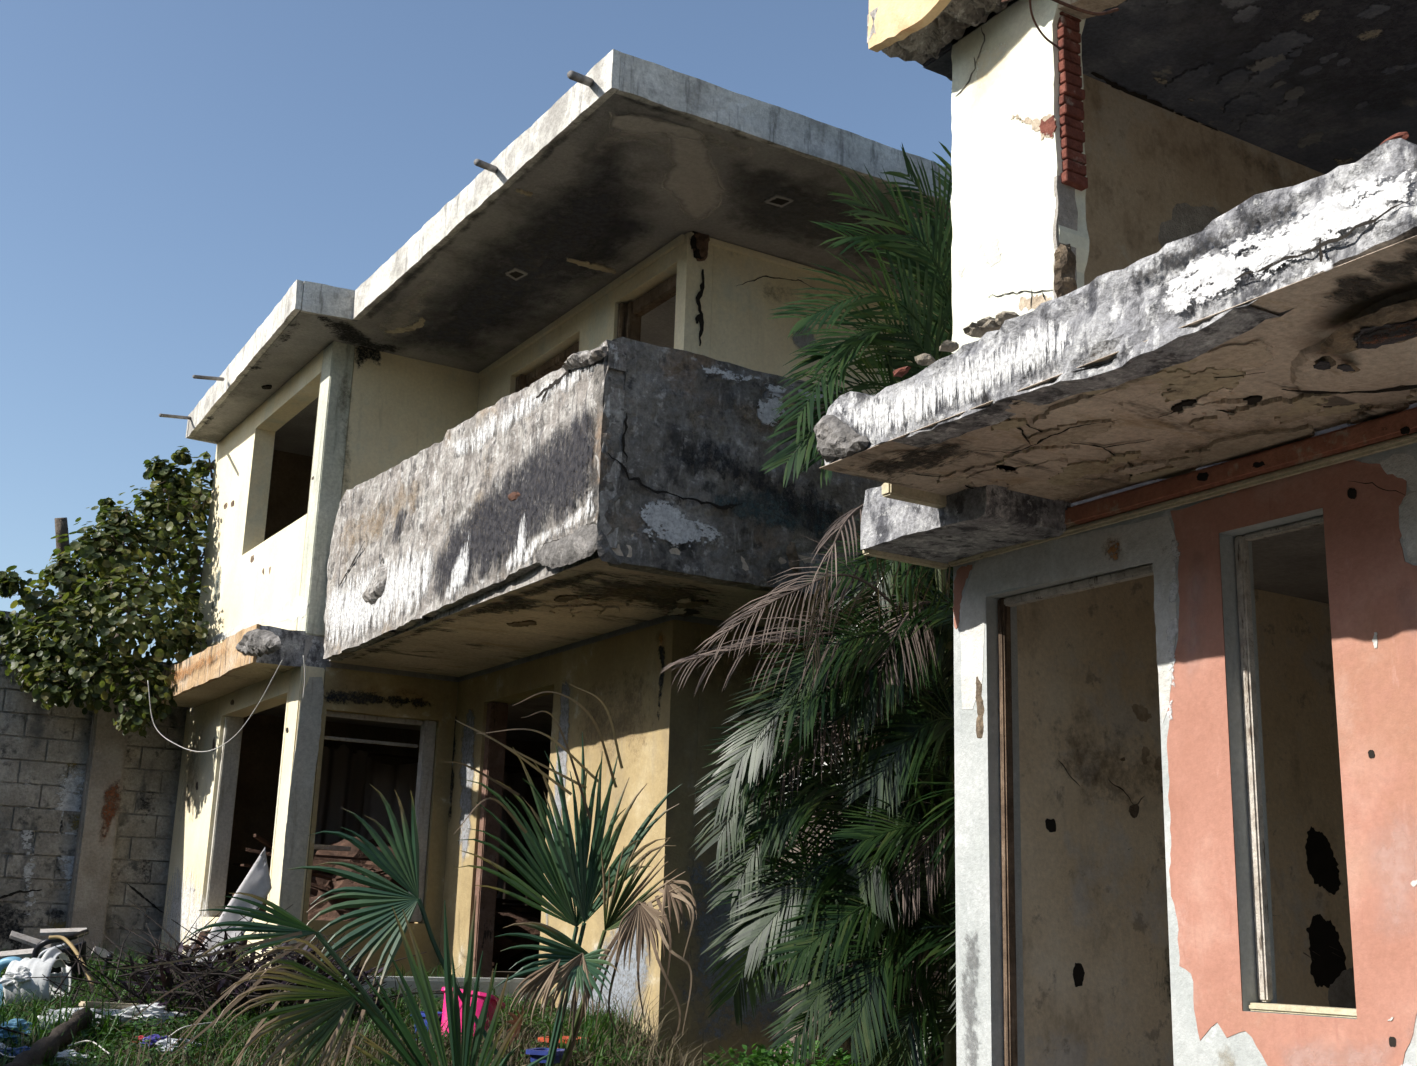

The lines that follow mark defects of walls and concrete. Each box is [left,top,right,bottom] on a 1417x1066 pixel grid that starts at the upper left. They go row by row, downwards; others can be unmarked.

flaking render [1011,0,1186,191]
water stain [610,99,724,219]
crack [695,269,825,346]
peeling [1295,259,1332,279]
crack [1234,200,1410,280]
water stain [433,405,595,599]
crack [608,413,743,510]
water stain [640,500,721,547]
water stain [702,365,834,426]
spalling [813,404,869,462]
peeling [884,341,1417,501]
peeling [953,453,1417,1066]